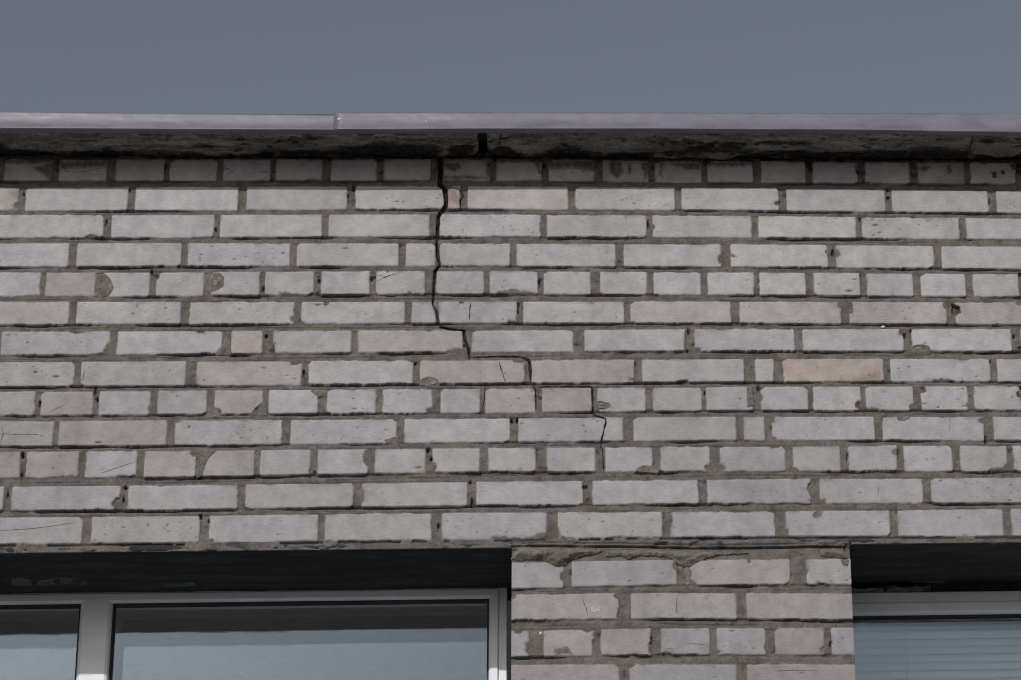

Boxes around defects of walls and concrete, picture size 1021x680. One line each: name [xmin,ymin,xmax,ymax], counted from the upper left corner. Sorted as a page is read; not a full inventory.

water stain [0,137,1021,182]
crack [430,157,607,474]